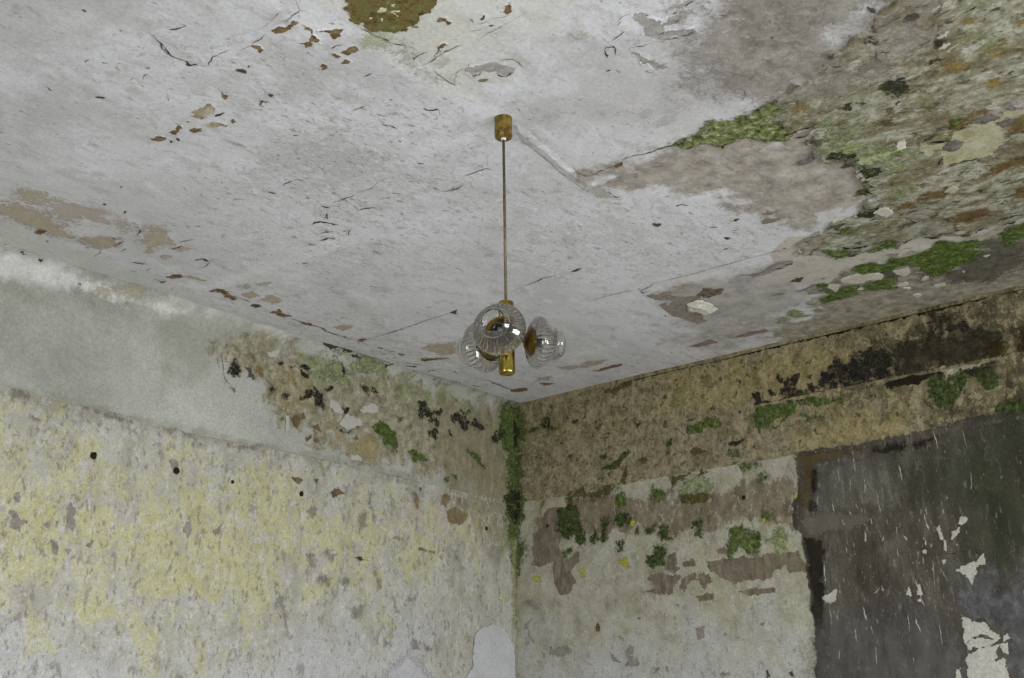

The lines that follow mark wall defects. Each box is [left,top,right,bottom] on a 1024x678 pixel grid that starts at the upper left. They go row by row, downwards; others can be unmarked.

flaking render [460,62,516,82]
peeling [151,92,237,143]
crack [524,142,677,193]
damp [666,0,1024,286]
flaking render [896,109,1024,168]
flaking render [647,288,724,326]
peeling [777,262,946,306]
damp [751,307,1004,408]
flaking render [266,349,379,443]
peeling [530,497,580,595]
damp [792,410,1024,678]
peeling [999,633,1010,654]